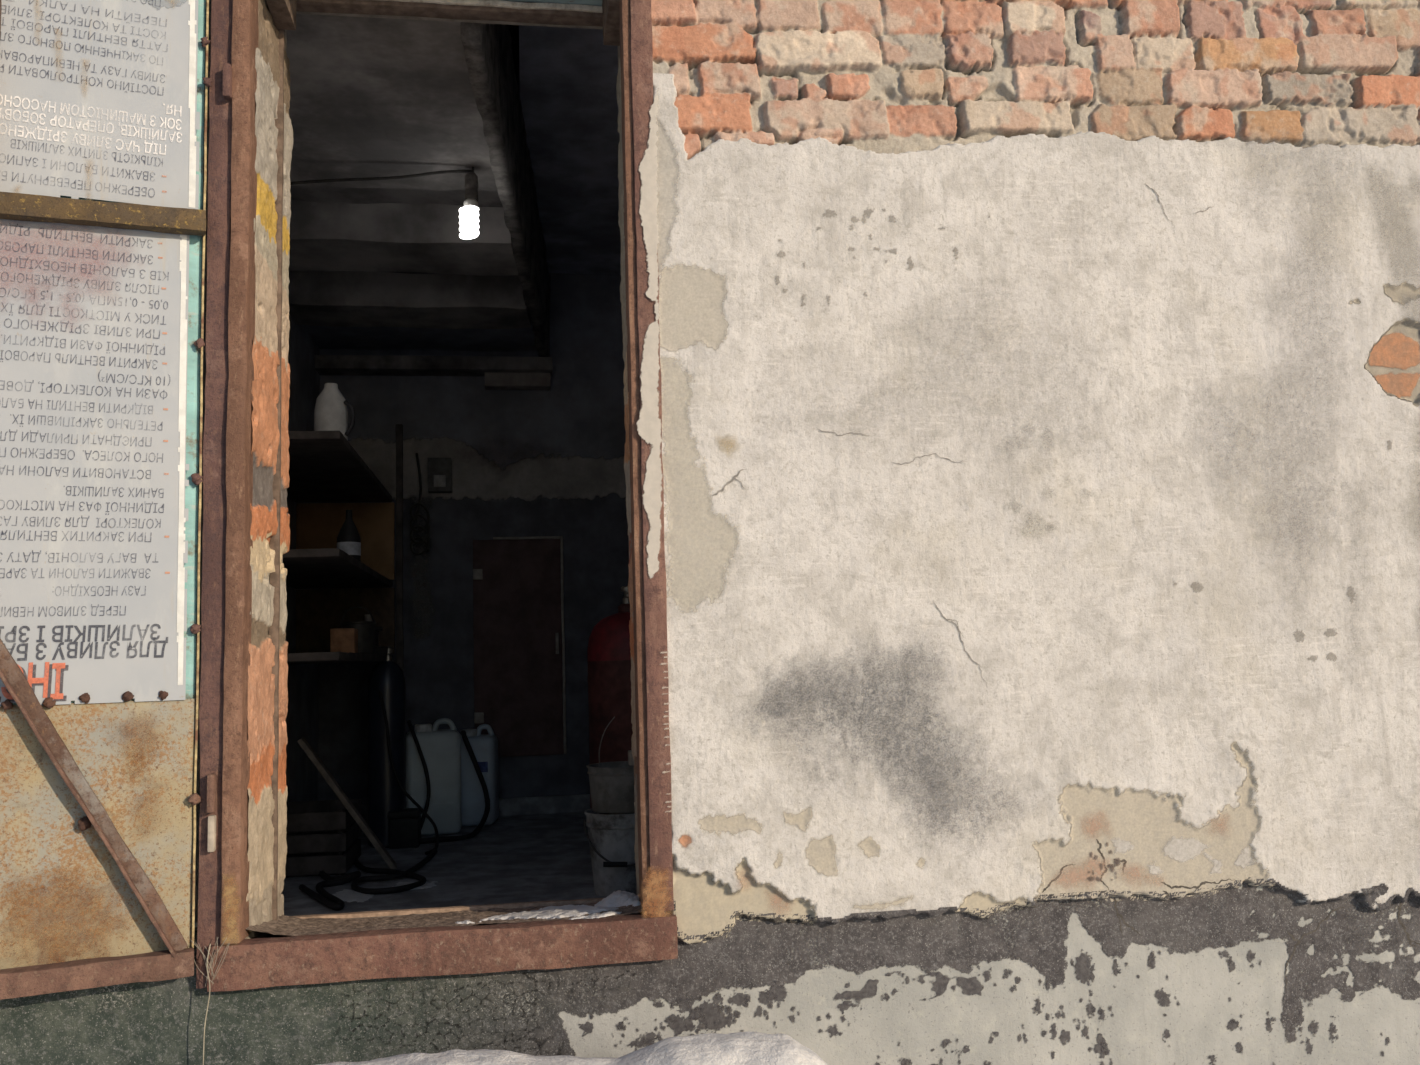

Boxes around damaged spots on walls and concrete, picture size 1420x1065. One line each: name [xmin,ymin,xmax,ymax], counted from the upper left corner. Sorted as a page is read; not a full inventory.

peeling [656,120,739,613]
spalling [1364,282,1420,406]
crack [934,603,987,686]
flaking render [956,742,1276,918]
rust [222,877,239,942]
flaking render [668,814,817,944]
peeling [613,979,800,1051]
peeling [817,950,1114,1065]
peeling [1112,951,1180,1042]
peeling [1227,1015,1243,1053]
peeling [1219,950,1262,1001]
peeling [1298,1007,1338,1054]